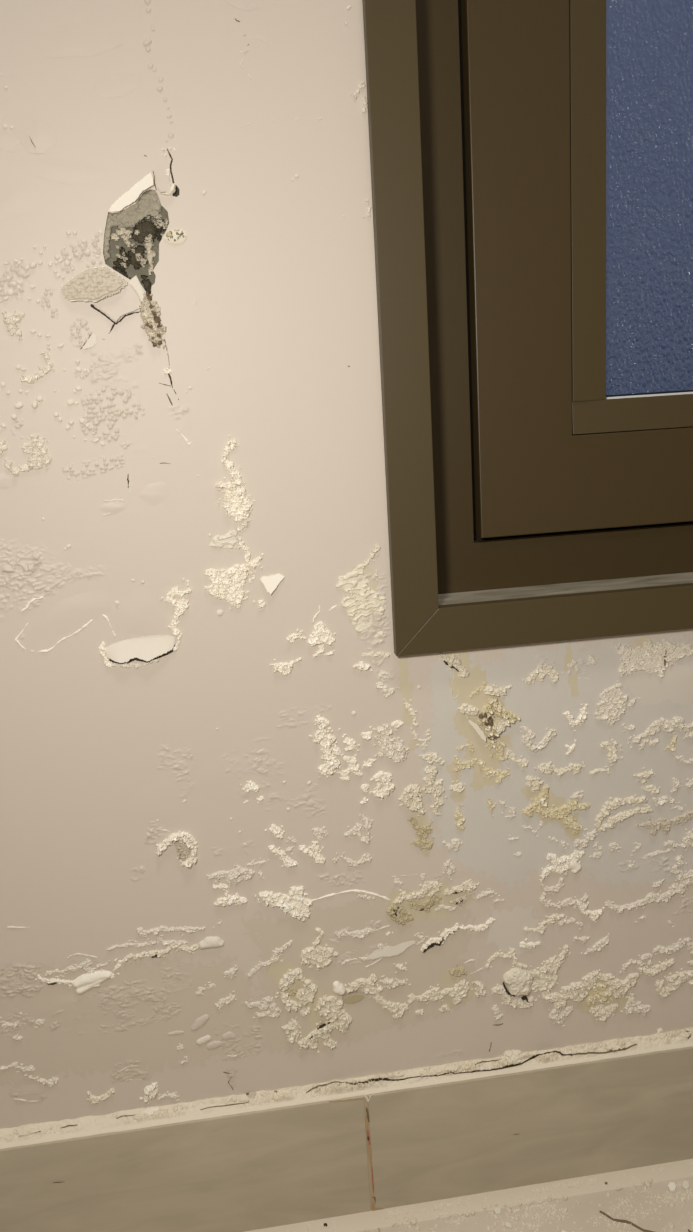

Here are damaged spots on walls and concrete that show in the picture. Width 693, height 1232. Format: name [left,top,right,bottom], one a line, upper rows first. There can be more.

crack [153,149,174,190]
spalling [59,147,188,349]
crack [81,304,139,349]
spalling [248,570,285,611]
peeling [15,596,183,668]
water stain [0,544,693,1104]
crack [503,982,528,1002]
crack [306,1023,637,1093]